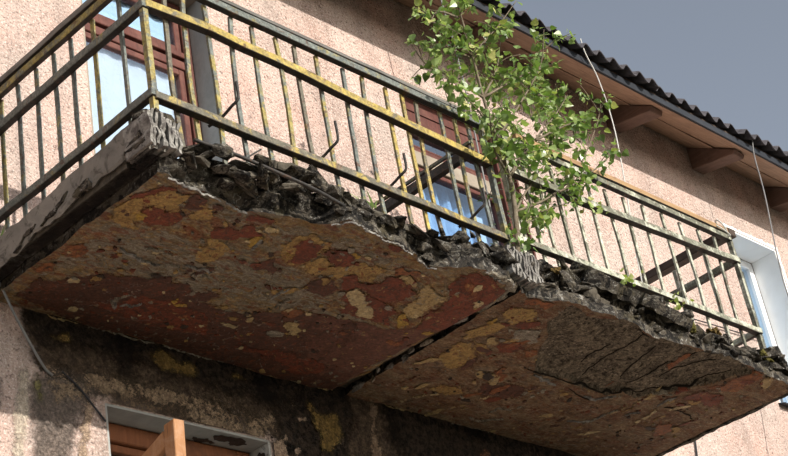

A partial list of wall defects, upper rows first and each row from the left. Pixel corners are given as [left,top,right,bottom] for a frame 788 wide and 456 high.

peeling [13,107,520,390]
peeling [46,364,300,456]
leakage [13,308,575,456]
spalling [378,259,788,456]
crack [527,334,731,419]